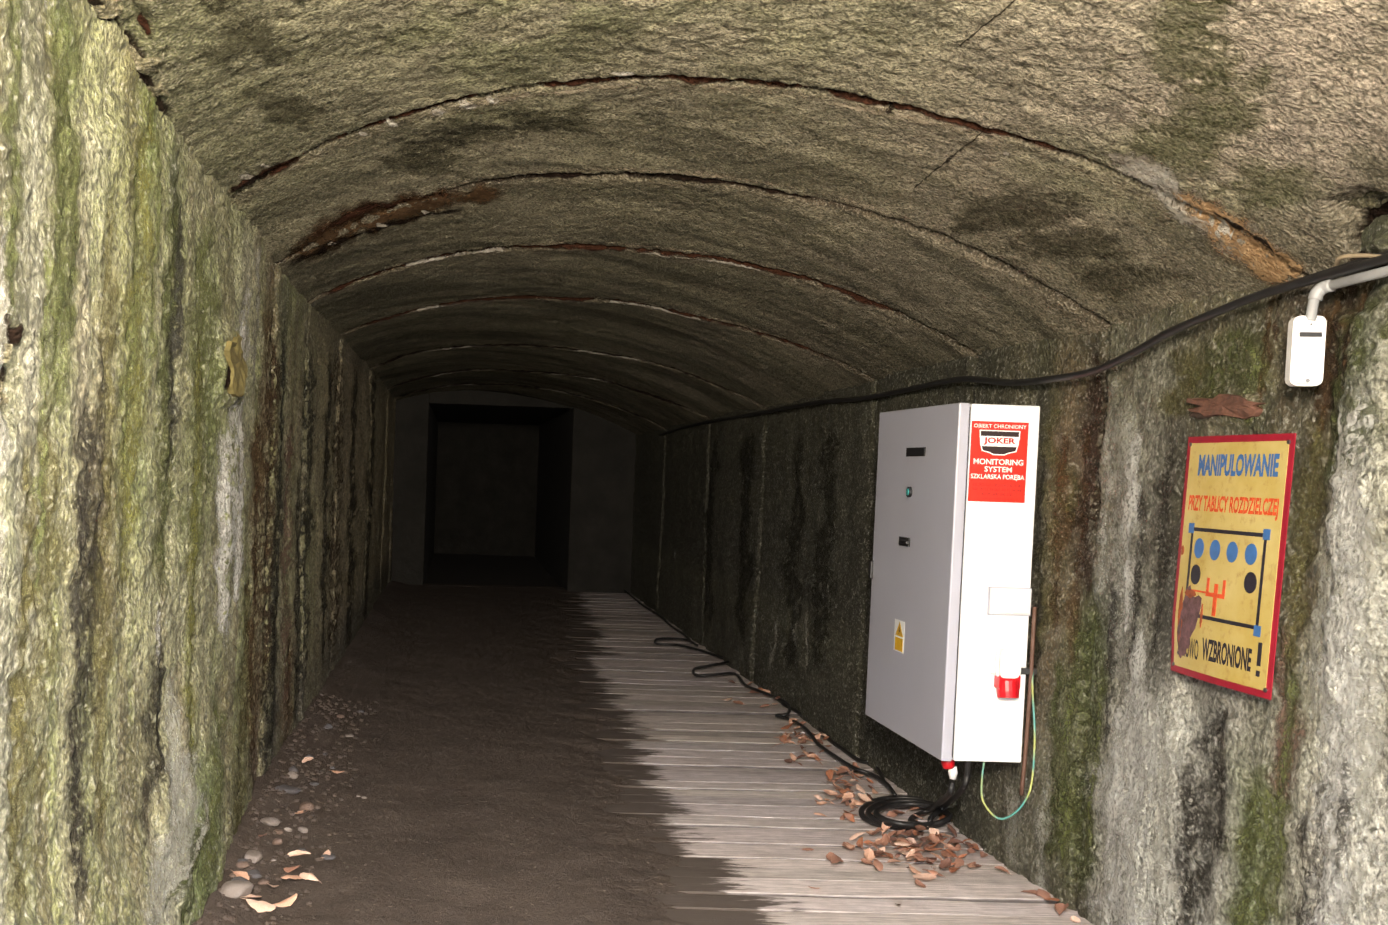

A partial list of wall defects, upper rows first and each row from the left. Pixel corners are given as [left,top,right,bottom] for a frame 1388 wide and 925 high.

crack [957,0,1015,47]
crack [335,72,1067,188]
rust [286,183,501,264]
crack [441,167,876,210]
damp [67,339,107,897]